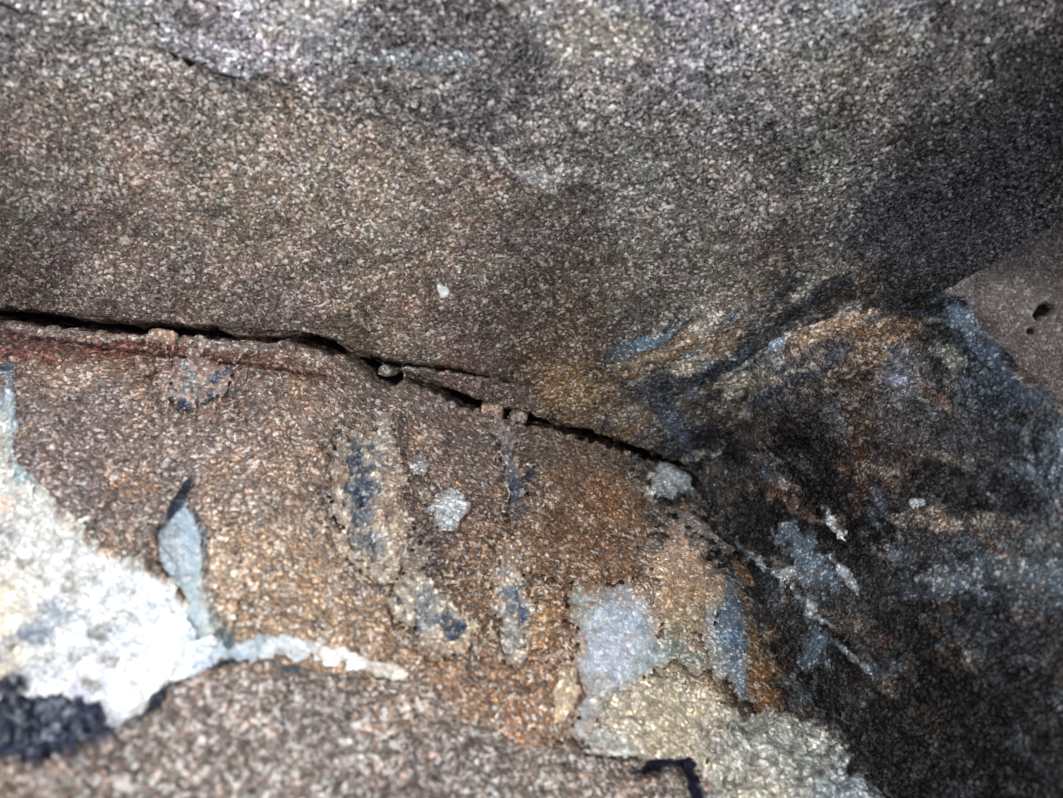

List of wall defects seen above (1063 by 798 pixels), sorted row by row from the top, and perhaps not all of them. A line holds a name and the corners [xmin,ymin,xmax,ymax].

corrosion [0,319,366,390]
leakage [720,270,1041,407]
crack [0,310,705,489]
efflorescence [1055,427,1063,460]
corrosion [486,361,673,652]
leakage [606,324,910,702]
leakage [908,498,927,508]
peeling [889,503,1010,536]
spalling [0,362,876,798]
leakage [883,547,1063,610]
crack [628,757,707,798]